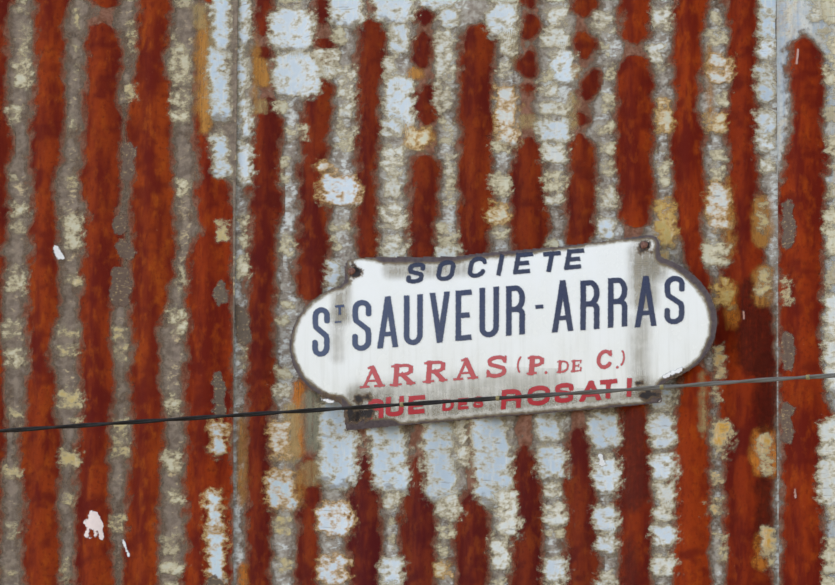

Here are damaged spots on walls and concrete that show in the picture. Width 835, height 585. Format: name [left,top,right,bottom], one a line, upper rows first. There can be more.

corrosion [306,0,390,258]
peeling [267,0,463,257]
peeling [484,0,524,154]
peeling [533,0,579,205]
peeling [751,0,777,175]
corrosion [0,0,339,585]
corrosion [340,0,835,585]
peeling [263,420,299,539]
peeling [315,398,525,585]
peeling [535,412,570,538]
peeling [586,408,623,557]
peeling [645,389,681,578]